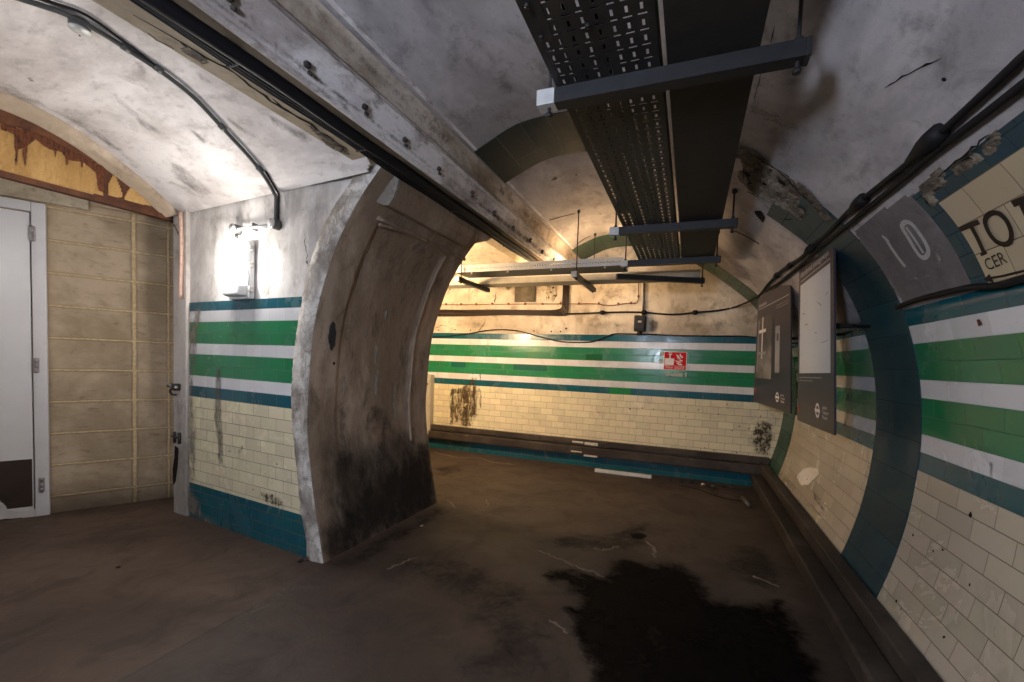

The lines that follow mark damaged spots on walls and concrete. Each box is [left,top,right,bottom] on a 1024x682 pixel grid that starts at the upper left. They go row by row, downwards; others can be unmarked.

crack [885,58,941,88]
flaking render [736,147,833,223]
flaking render [918,130,1002,206]
water stain [214,370,223,461]
water stain [450,374,482,426]
water stain [753,421,772,455]
water stain [328,439,453,560]
water stain [545,526,820,682]